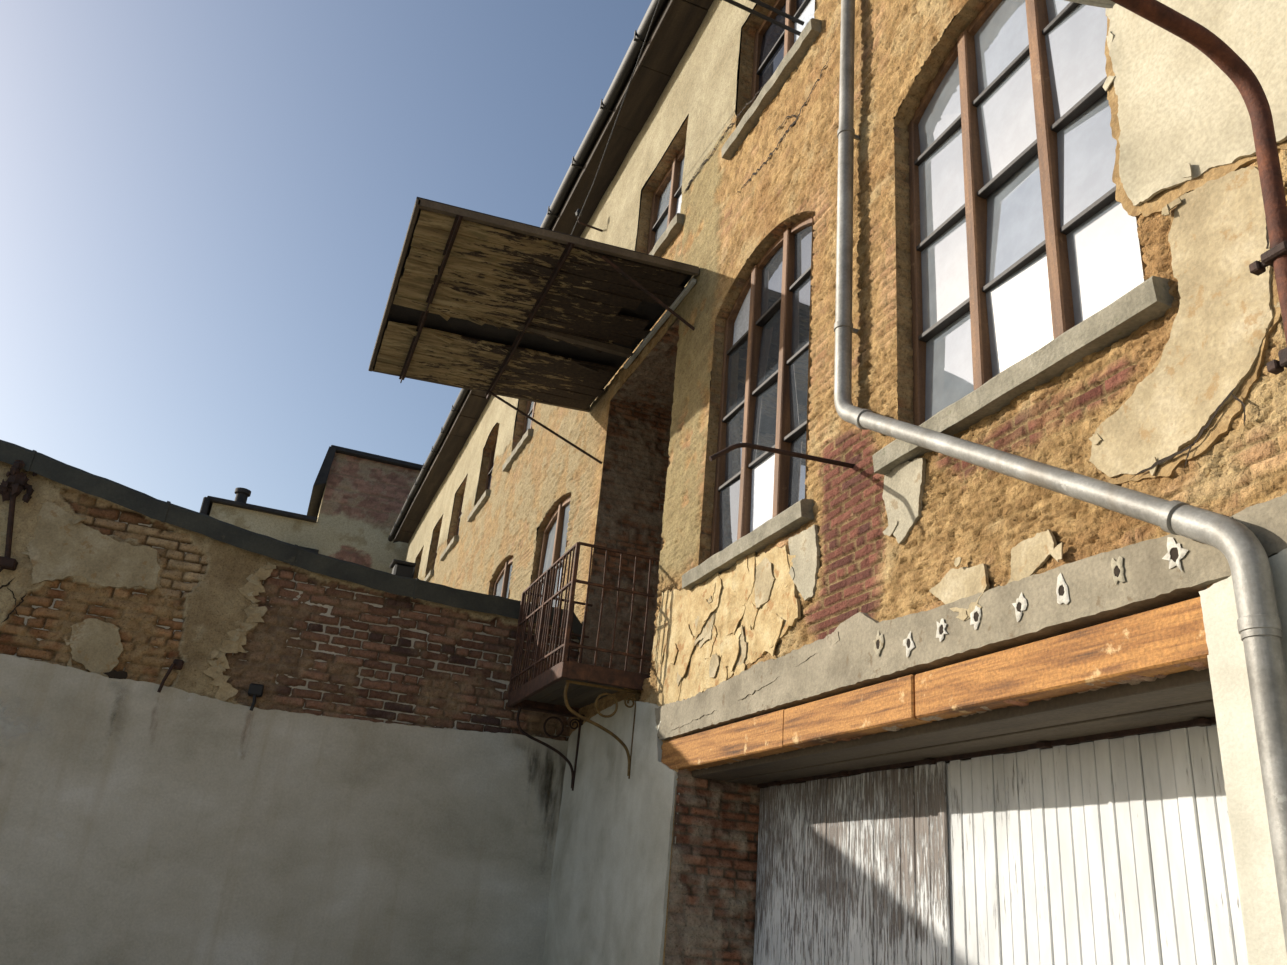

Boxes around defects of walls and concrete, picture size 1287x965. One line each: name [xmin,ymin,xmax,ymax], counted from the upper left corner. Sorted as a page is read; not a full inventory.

flaking render [976,0,1287,485]
spalling [937,455,992,486]
spalling [0,488,207,687]
spalling [202,560,579,741]
flaking render [651,429,898,706]
spalling [903,631,915,657]
flaking render [929,557,990,642]
flaking render [1007,529,1069,622]
damp [535,752,566,806]